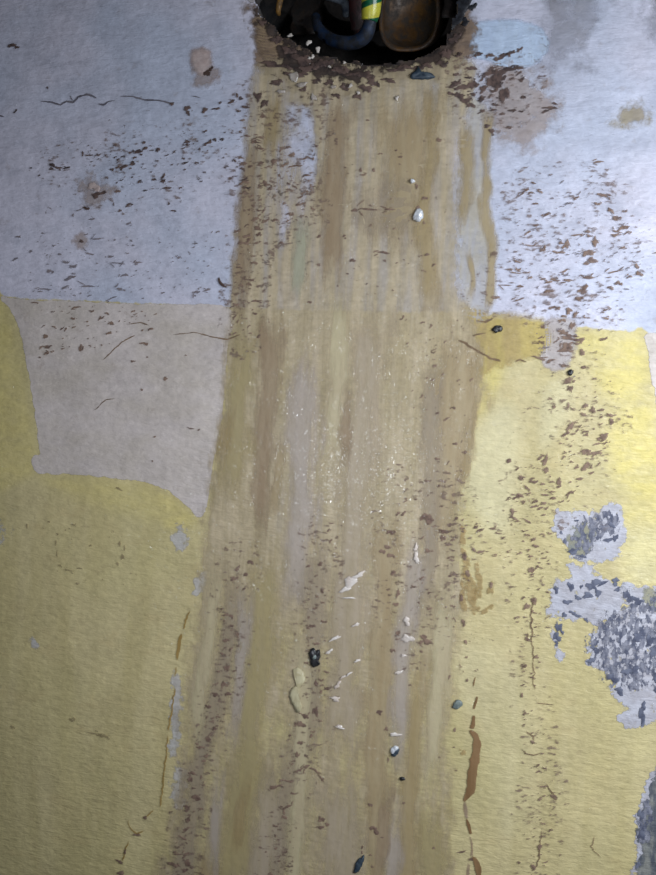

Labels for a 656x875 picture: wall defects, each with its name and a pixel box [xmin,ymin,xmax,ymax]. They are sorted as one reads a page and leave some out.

damp [614,107,650,128]
spalling [72,182,121,220]
damp [71,132,182,212]
damp [24,233,172,358]
peeling [1,296,232,517]
damp [155,14,644,875]
peeling [540,317,576,376]
peeling [644,333,656,396]
spalling [546,501,656,729]
corrosion [460,697,481,802]
corrosion [457,850,482,875]
spalling [630,770,656,875]